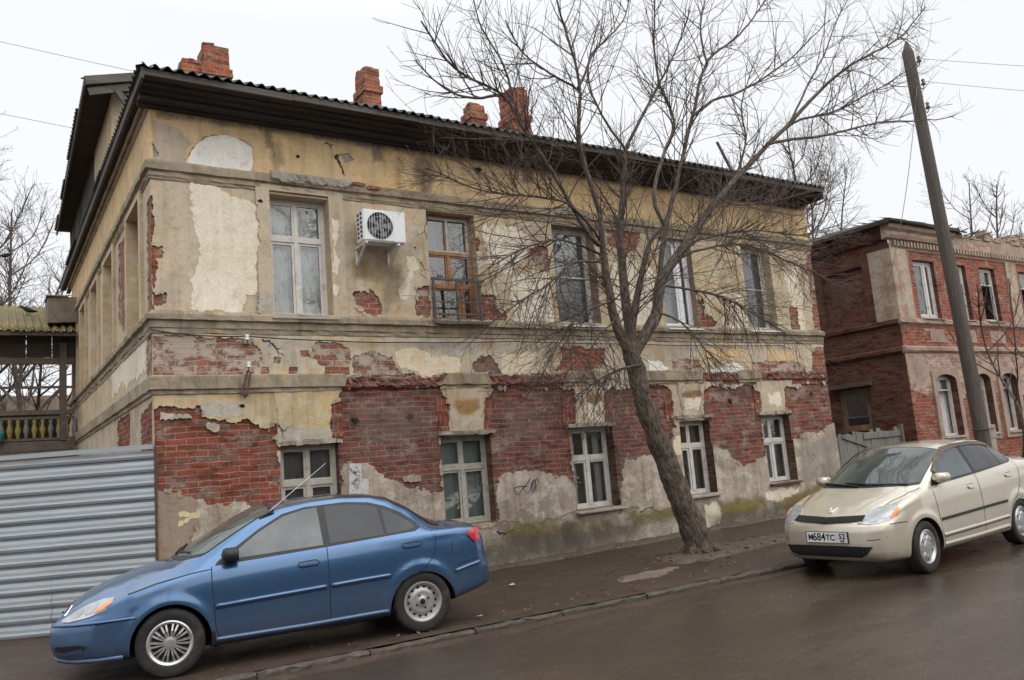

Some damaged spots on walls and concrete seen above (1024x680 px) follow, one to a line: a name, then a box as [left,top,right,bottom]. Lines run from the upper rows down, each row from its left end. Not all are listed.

peeling [188,182,264,312]
flaking render [352,288,382,316]
flaking render [398,246,431,318]
flaking render [118,401,282,507]
flaking render [261,350,314,374]
flaking render [325,366,449,493]
flaking render [478,368,652,548]
flaking render [649,385,676,443]
flaking render [705,381,765,467]
flaking render [785,360,833,439]